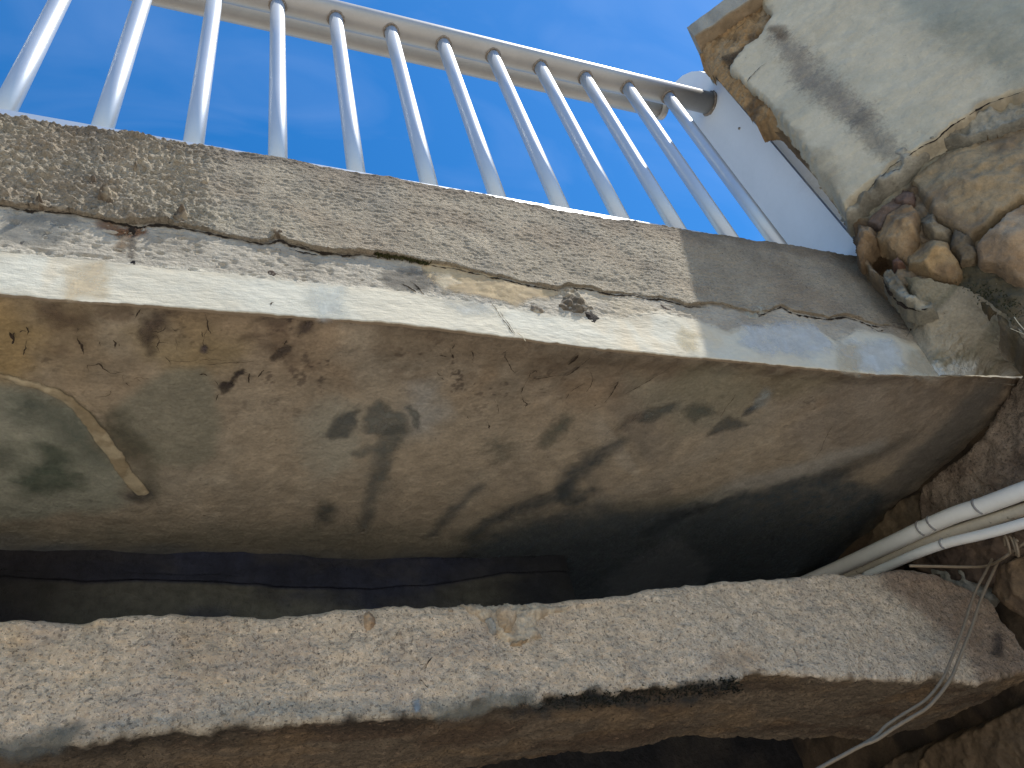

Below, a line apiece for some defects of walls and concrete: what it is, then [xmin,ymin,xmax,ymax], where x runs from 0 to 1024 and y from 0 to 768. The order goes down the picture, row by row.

crack [0,205,382,259]
crack [432,265,705,308]
crack [758,306,912,332]
leakage [709,393,768,435]
leakage [328,402,419,527]